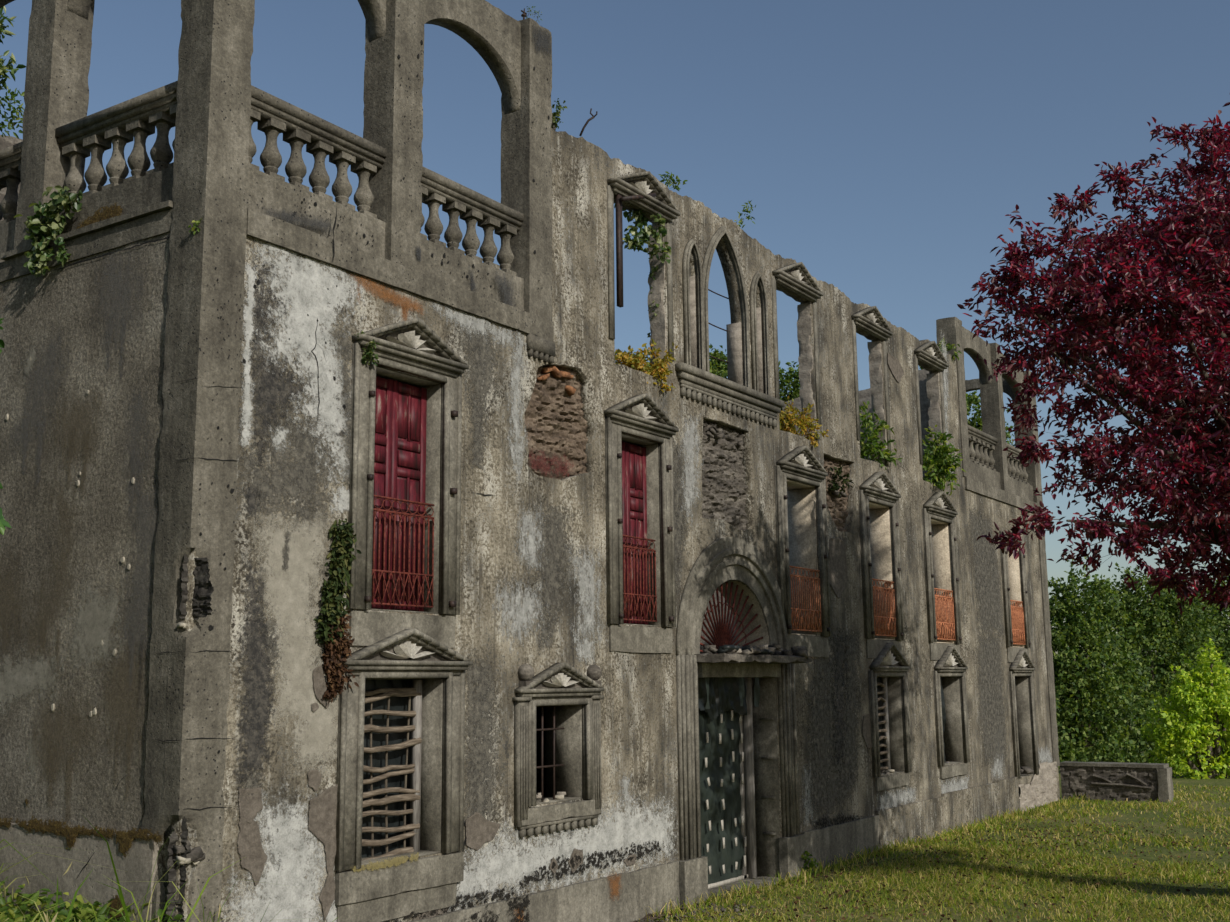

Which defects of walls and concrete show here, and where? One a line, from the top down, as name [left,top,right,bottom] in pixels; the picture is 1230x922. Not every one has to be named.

water stain [237,250,353,570]
spalling [536,365,576,396]
water stain [33,391,158,820]
water stain [234,552,279,795]
peeling [237,788,267,885]
peeling [307,769,338,922]